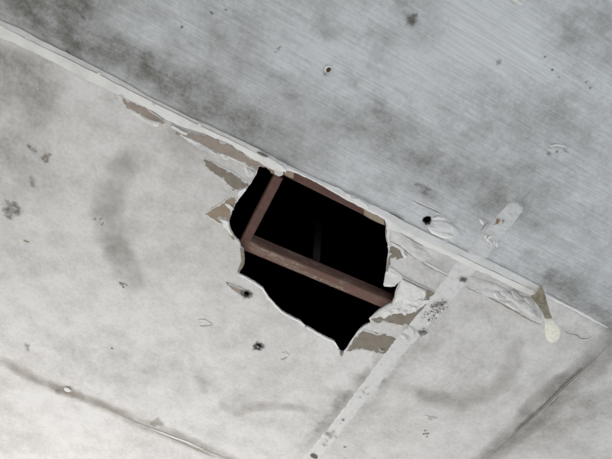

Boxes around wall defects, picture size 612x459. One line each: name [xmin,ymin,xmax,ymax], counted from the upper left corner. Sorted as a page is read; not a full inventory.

peeling [105,94,288,225]
peeling [344,193,369,209]
peeling [389,243,407,265]
flaking render [347,280,447,355]